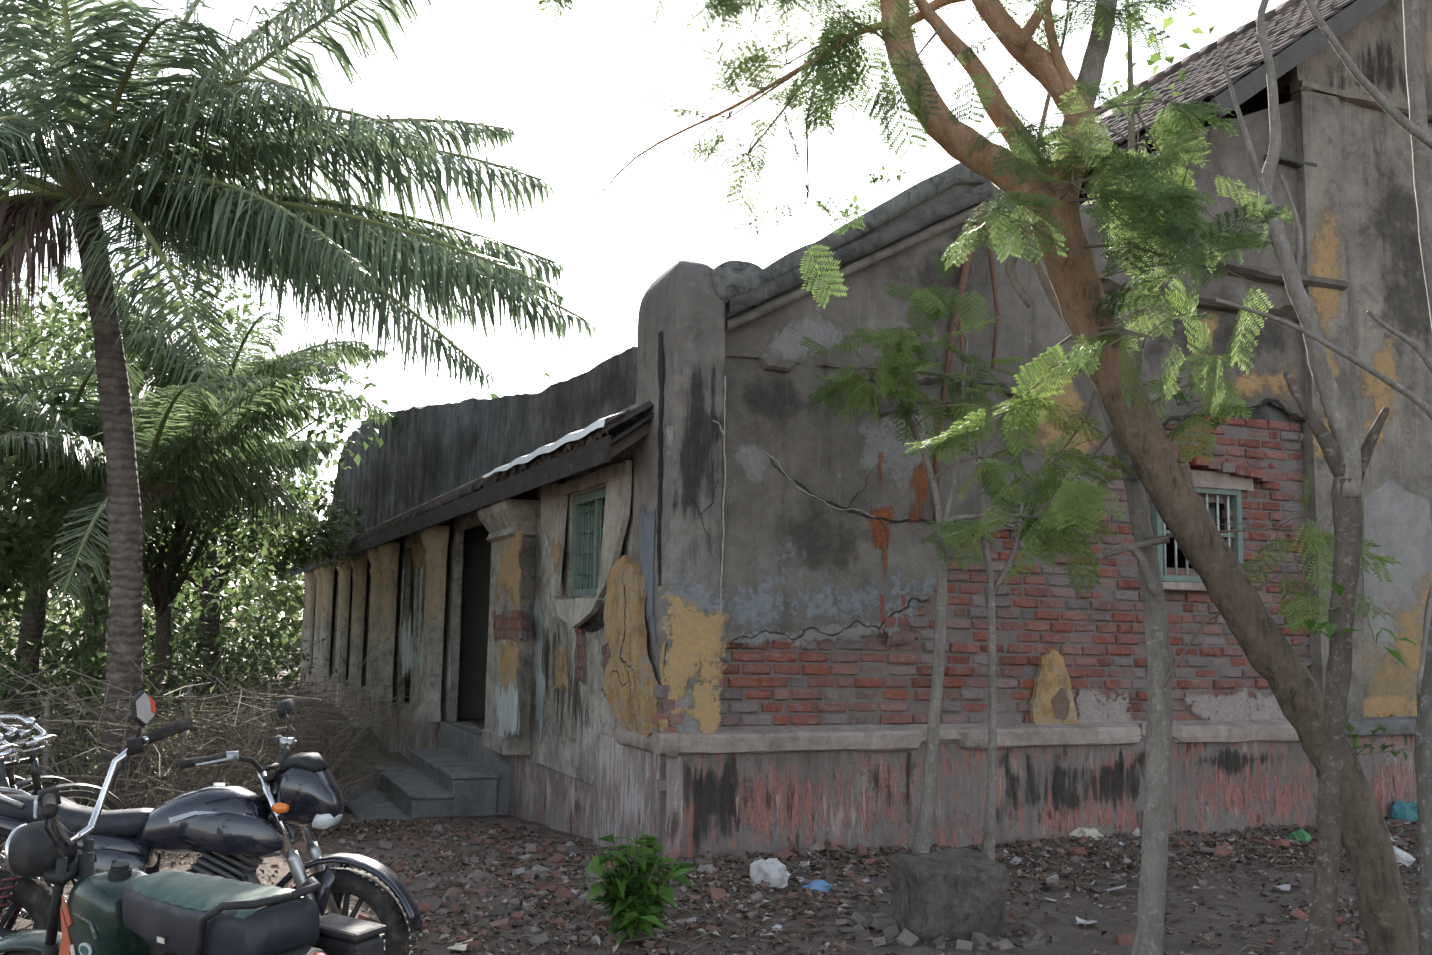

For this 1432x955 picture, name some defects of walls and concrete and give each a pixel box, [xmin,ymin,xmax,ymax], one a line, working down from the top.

damp [1330,41,1406,92]
peeling [492,525,526,693]
crack [656,330,726,615]
damp [673,368,724,516]
damp [640,508,937,643]
crack [763,449,936,560]
flaking render [652,452,1148,733]
flaking render [1163,557,1274,720]
flaking render [1162,369,1331,673]
peeling [1364,573,1431,717]
damp [684,756,745,854]
damp [996,752,1145,820]